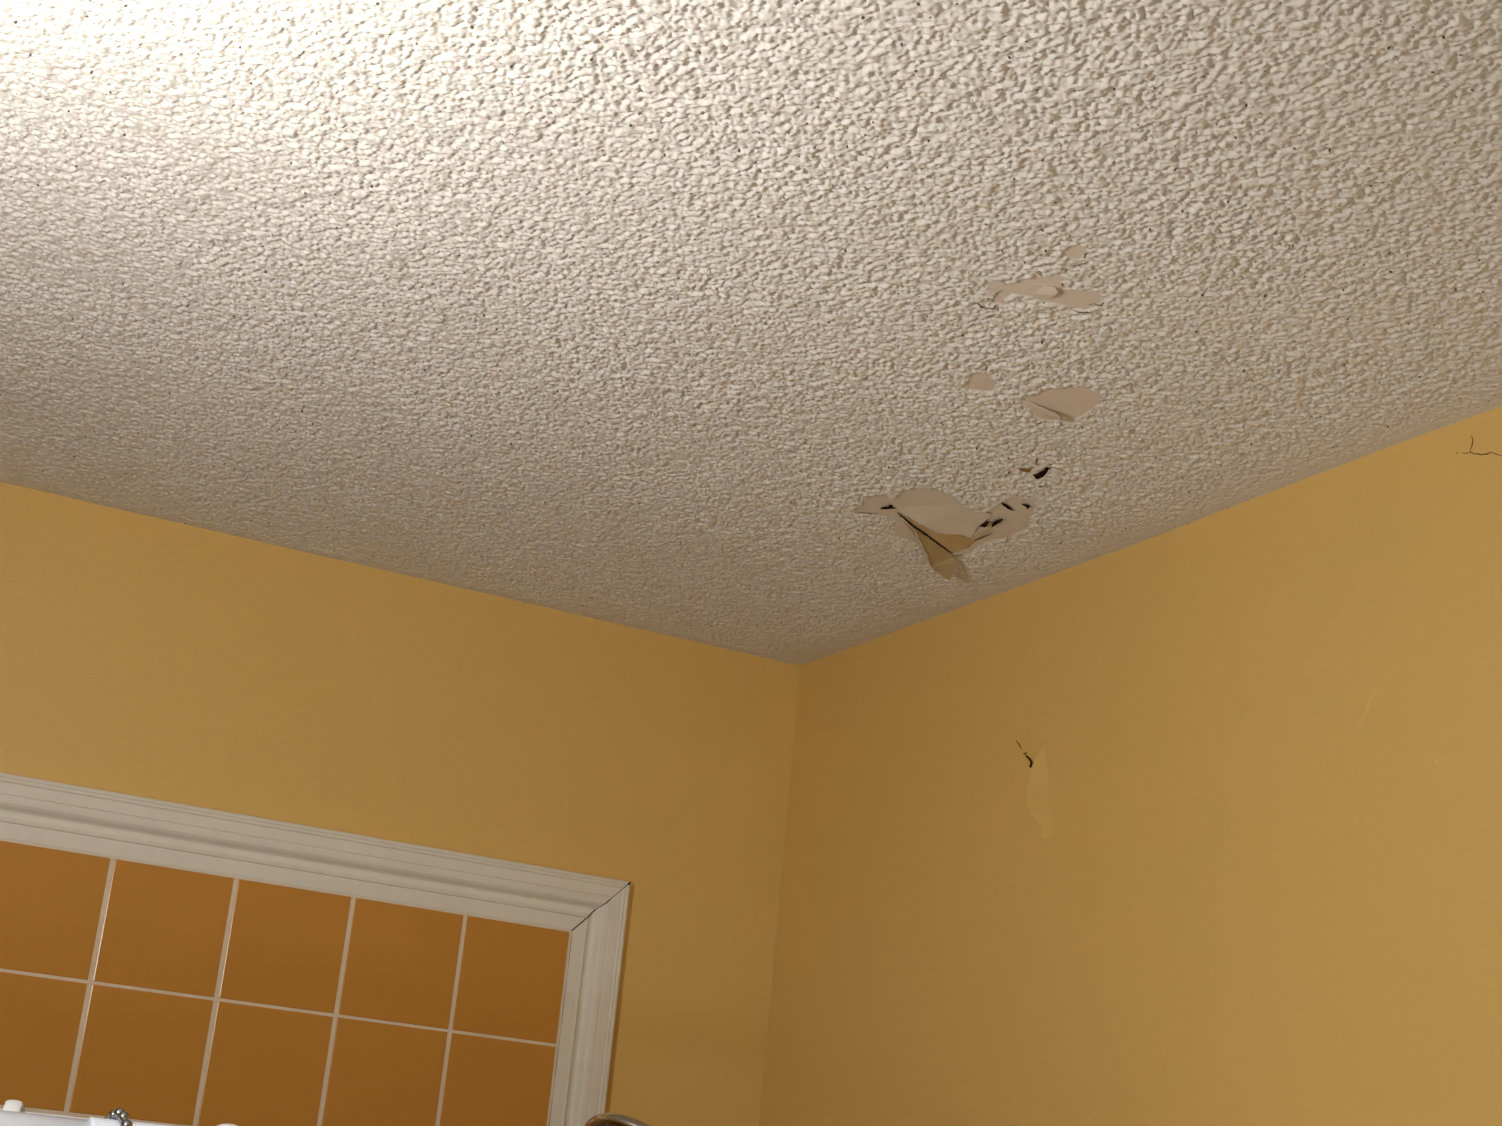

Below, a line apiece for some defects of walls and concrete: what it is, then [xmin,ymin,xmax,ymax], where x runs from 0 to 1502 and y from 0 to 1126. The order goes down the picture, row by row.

peeling [973,245,1104,319]
peeling [1022,387,1107,426]
peeling [856,488,1036,580]